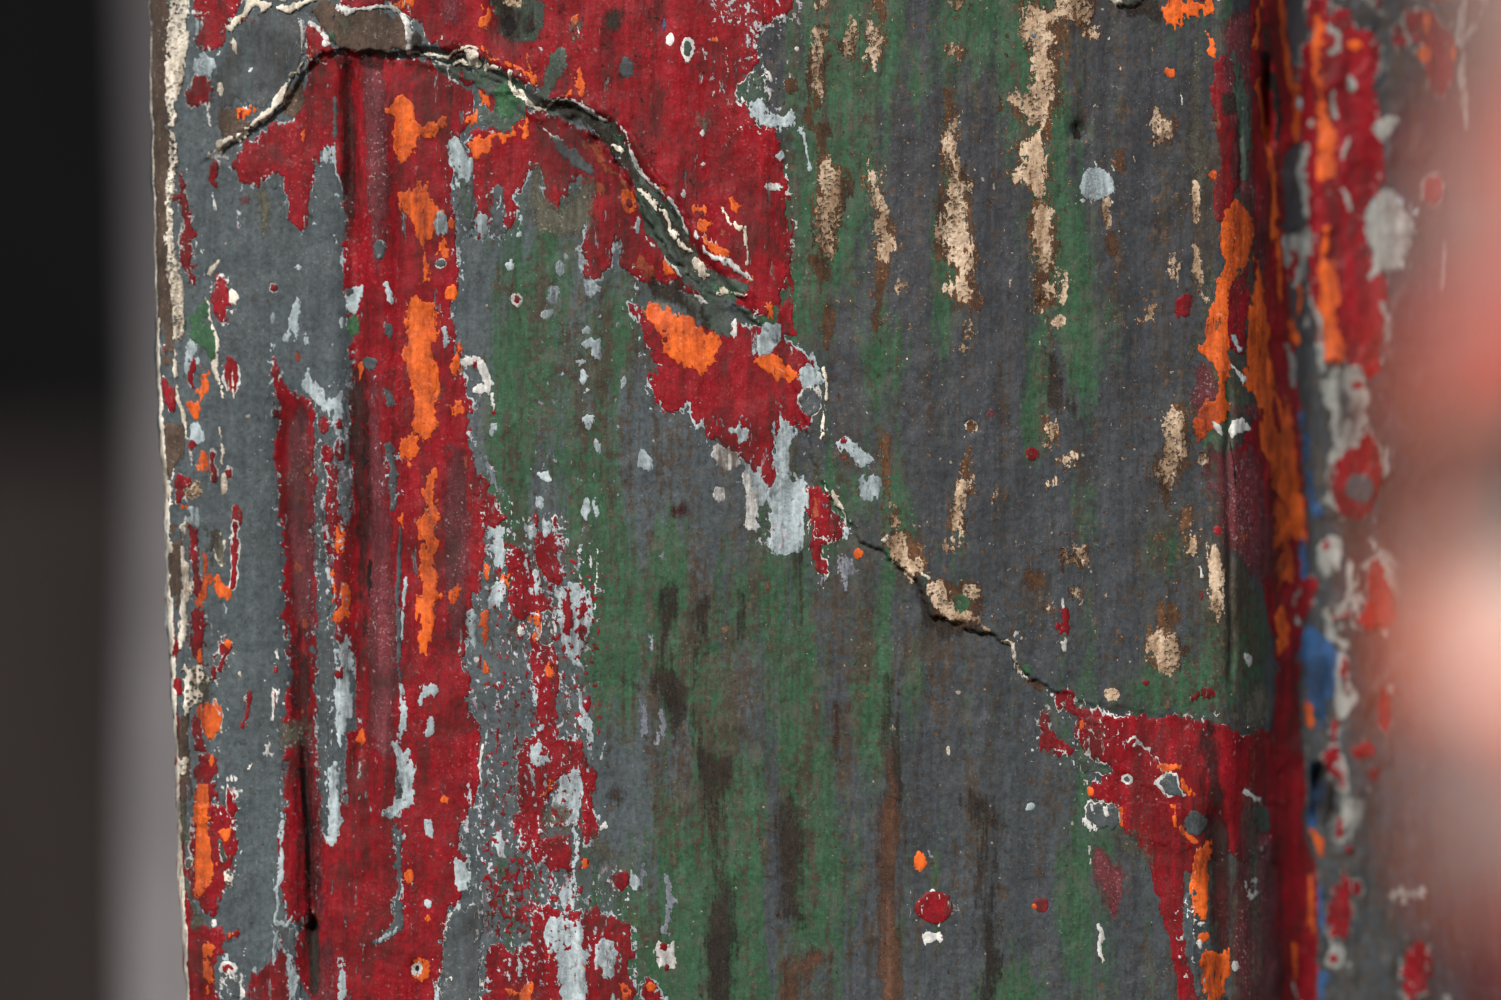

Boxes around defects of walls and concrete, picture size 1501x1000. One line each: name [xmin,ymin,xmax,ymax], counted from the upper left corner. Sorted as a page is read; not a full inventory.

crack [418,45,753,338]
crack [365,559,373,597]
peeling [148,0,882,1000]
spalling [880,527,1034,680]
peeling [1025,0,1501,1000]